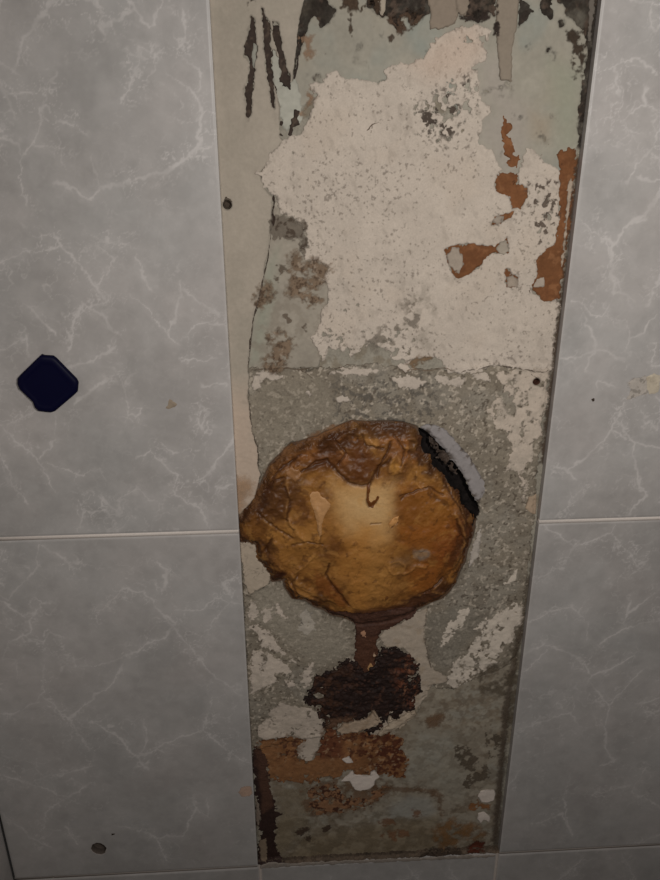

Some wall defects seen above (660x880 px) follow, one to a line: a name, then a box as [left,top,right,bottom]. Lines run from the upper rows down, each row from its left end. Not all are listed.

peeling [210,0,595,514]
peeling [310,491,331,537]
peeling [240,542,314,689]
corrosion [257,727,409,815]
peeling [255,608,518,862]